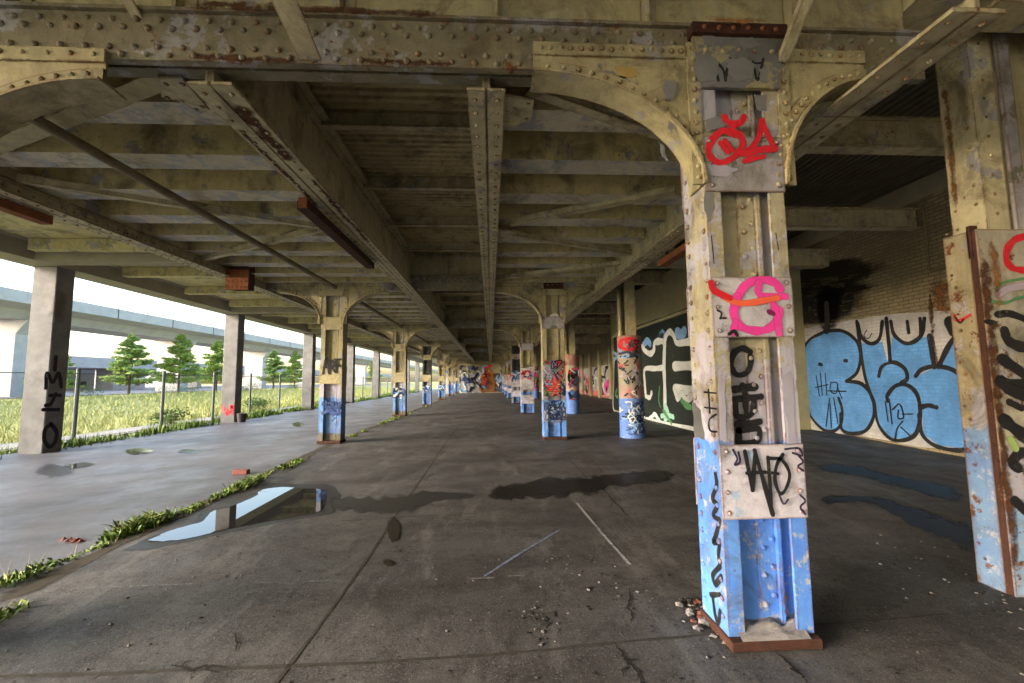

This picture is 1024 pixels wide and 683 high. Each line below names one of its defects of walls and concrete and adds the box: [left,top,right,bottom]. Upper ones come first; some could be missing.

rust [195,1,276,12]
rust [300,6,435,17]
rust [196,54,295,64]
rust [364,58,451,66]
rust [942,91,957,202]
rust [234,107,367,241]
rust [979,243,1018,568]
damp [488,469,674,500]
damp [818,464,961,501]
damp [329,490,473,513]
damp [821,495,974,549]